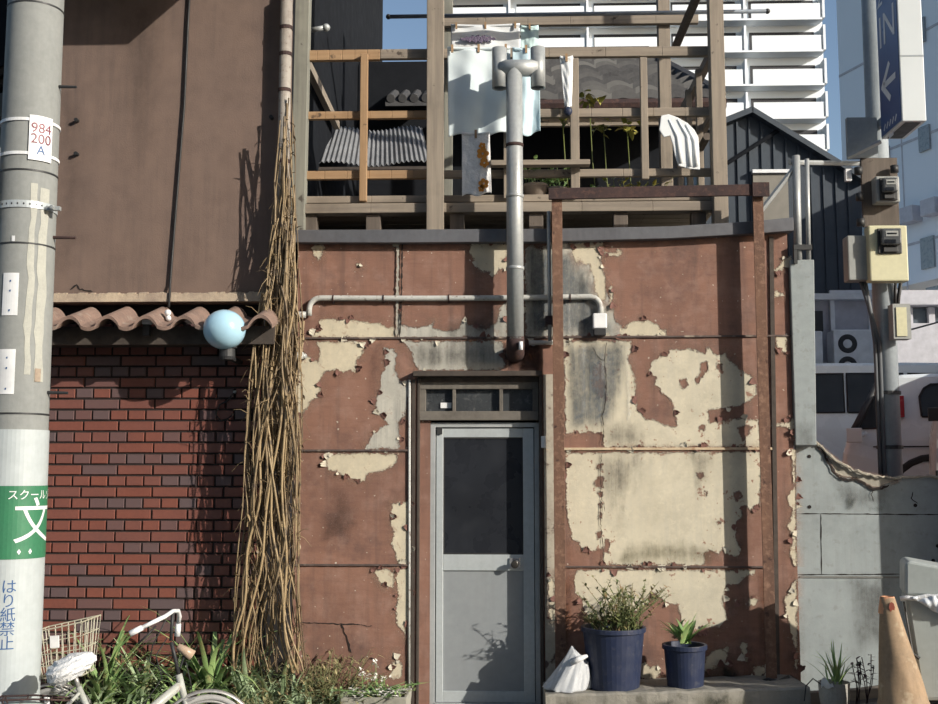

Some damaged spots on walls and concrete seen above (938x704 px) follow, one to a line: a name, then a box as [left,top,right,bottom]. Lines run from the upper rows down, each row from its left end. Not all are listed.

peeling [469,244,507,277]
peeling [774,255,792,276]
water stain [533,258,592,331]
peeling [776,337,789,355]
peeling [296,302,507,484]
peeling [523,242,761,637]
peeling [816,441,938,487]
peeling [770,415,803,567]
crack [302,622,370,653]
peeling [704,642,766,676]
peeling [783,579,806,673]